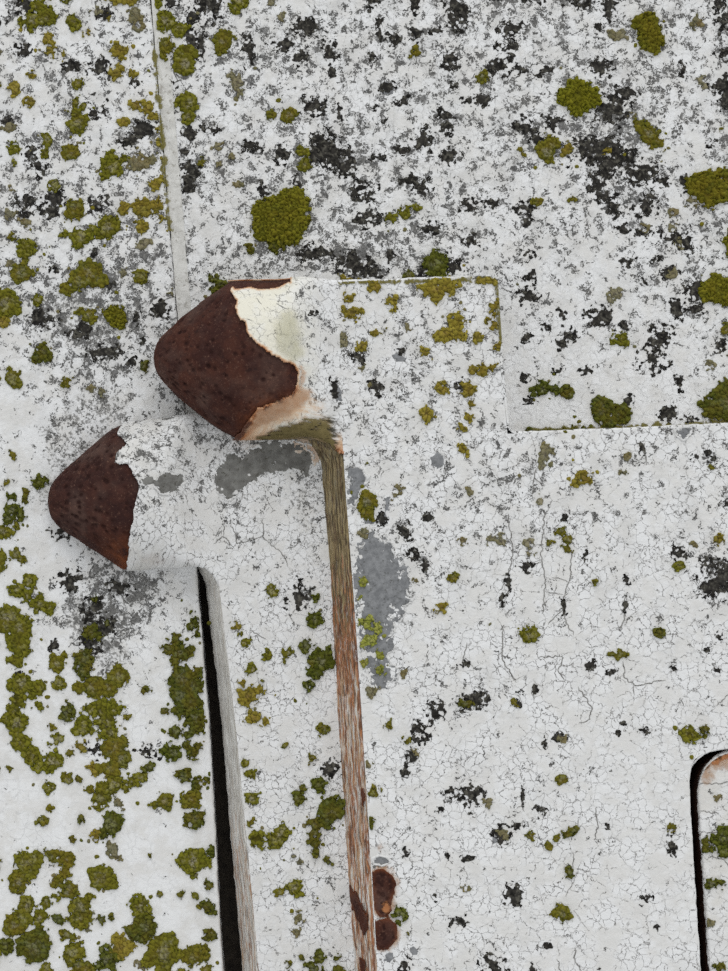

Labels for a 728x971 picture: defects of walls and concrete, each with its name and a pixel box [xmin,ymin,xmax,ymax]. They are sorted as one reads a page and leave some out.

rust [246,387,310,432]
crack [215,520,298,566]
crack [499,470,574,635]
crack [501,627,516,682]
crack [539,655,593,723]
crack [623,663,664,693]
rust [349,866,399,950]